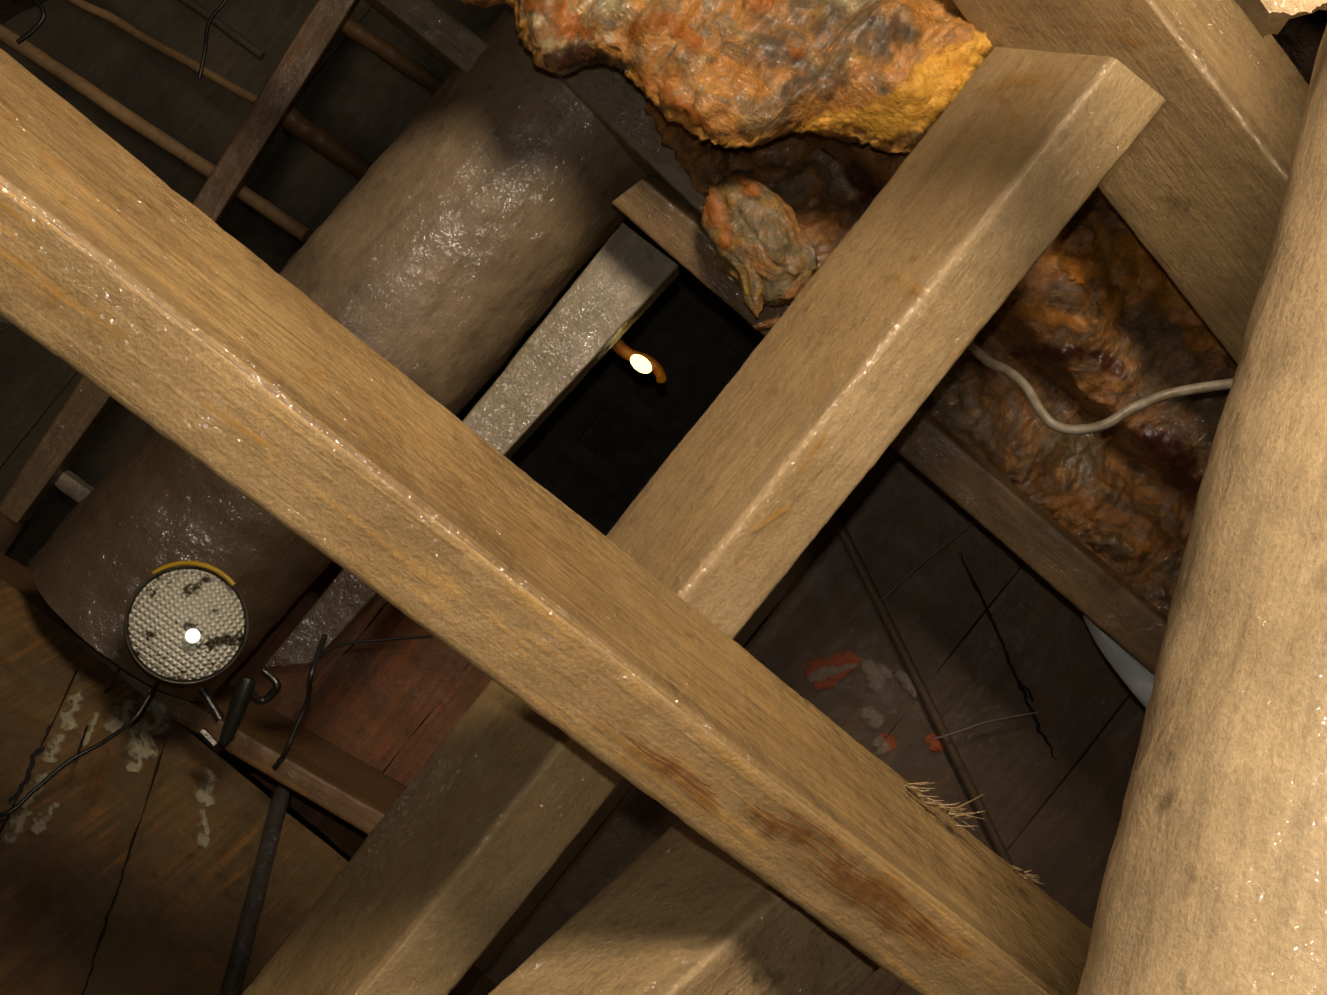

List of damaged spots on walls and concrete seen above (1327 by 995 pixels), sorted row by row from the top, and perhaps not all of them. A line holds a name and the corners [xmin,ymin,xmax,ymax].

crack [958,552,1056,761]
crack [0,720,55,839]
efflorescence [4,693,169,844]
water stain [196,769,216,848]